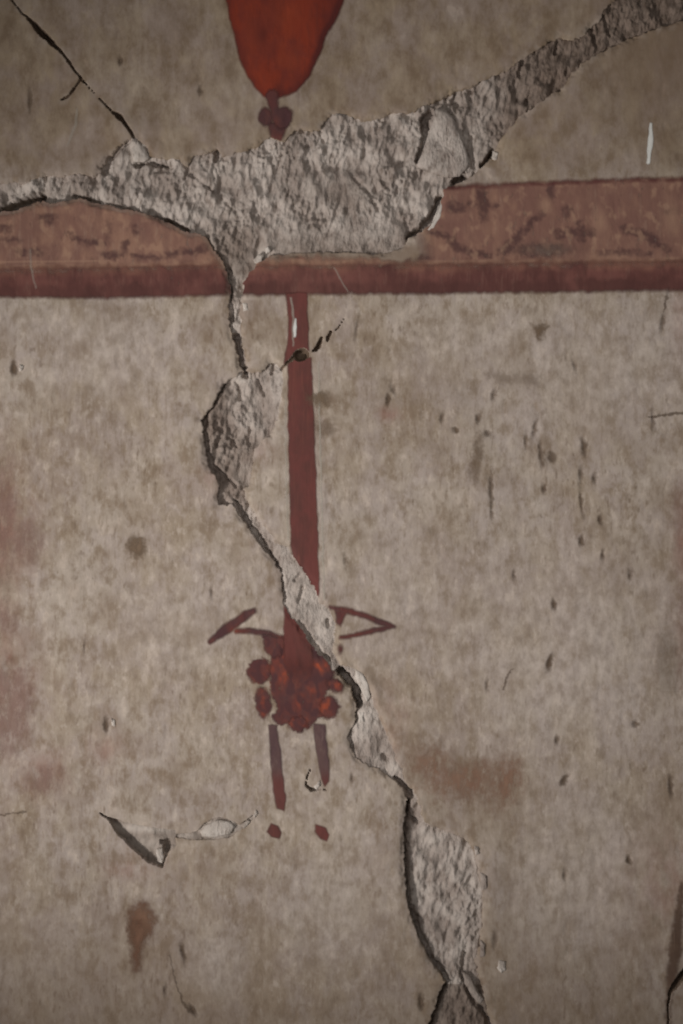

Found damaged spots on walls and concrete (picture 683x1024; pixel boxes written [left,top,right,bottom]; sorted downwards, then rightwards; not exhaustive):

crack [12,0,135,139]
flaking render [0,0,683,506]
spalling [102,810,258,866]
spalling [403,799,491,1024]